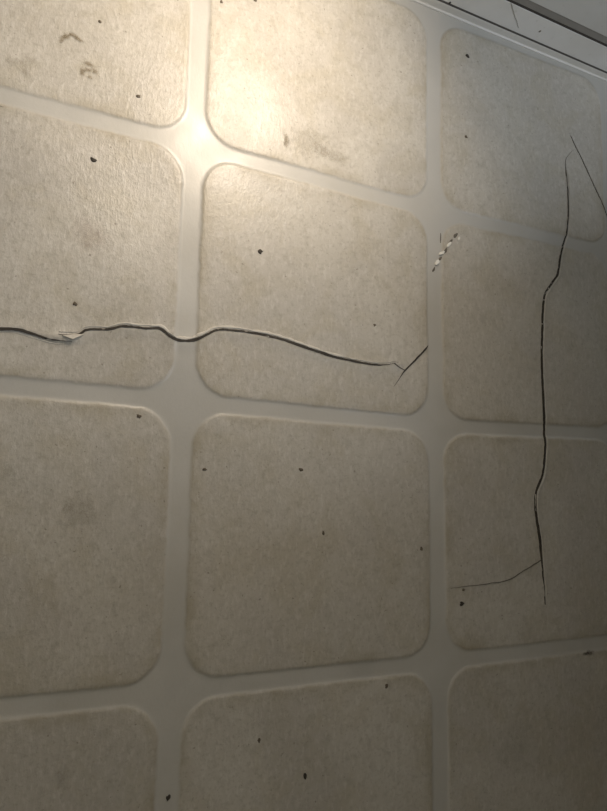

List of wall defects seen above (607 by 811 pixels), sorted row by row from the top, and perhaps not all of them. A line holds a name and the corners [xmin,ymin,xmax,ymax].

crack [0,322,428,386]
crack [457,135,607,605]